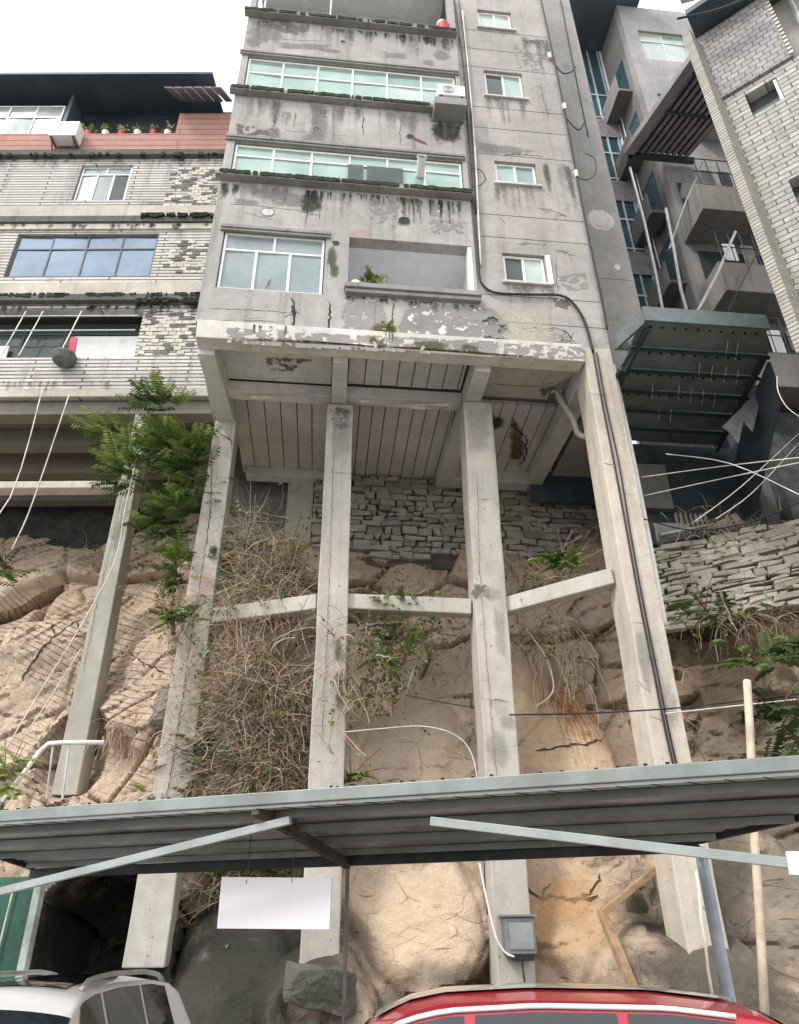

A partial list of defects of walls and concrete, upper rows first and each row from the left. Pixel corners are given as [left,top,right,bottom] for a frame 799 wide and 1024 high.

water stain [247,20,308,46]
water stain [322,26,453,65]
water stain [414,124,460,144]
water stain [221,183,461,216]
crack [212,279,299,326]
peeling [226,299,585,359]